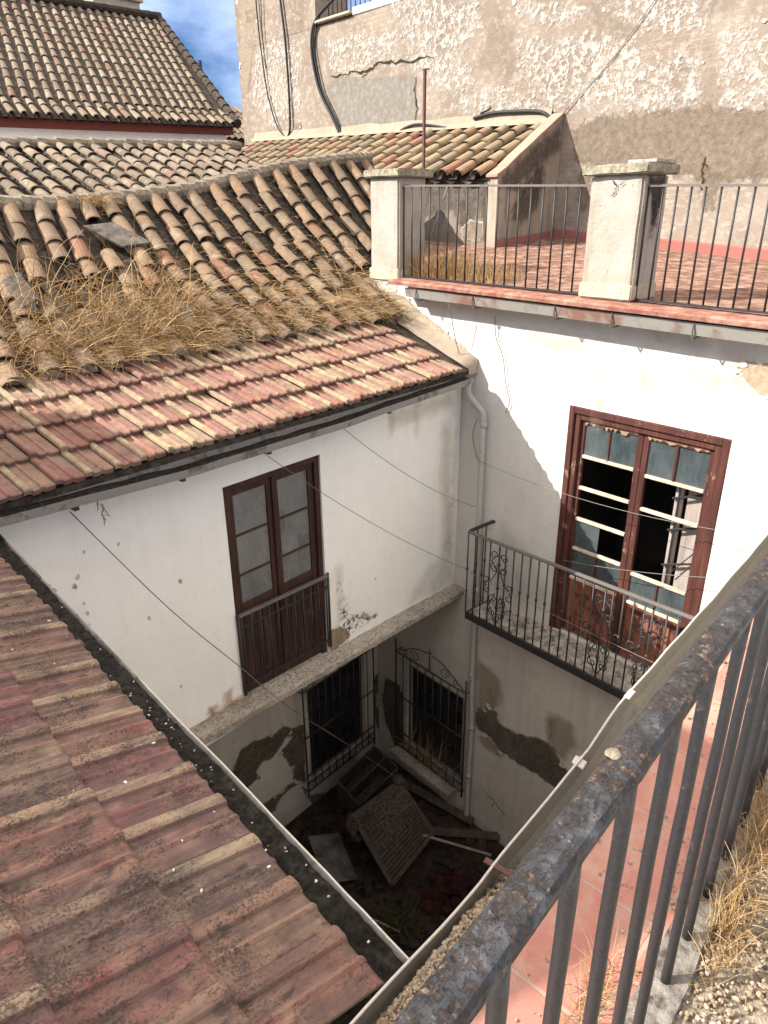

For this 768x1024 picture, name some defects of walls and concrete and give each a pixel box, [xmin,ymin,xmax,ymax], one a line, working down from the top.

crack [332,56,432,117]
spalling [329,626,351,652]
peeling [231,724,329,816]
peeling [474,703,568,788]